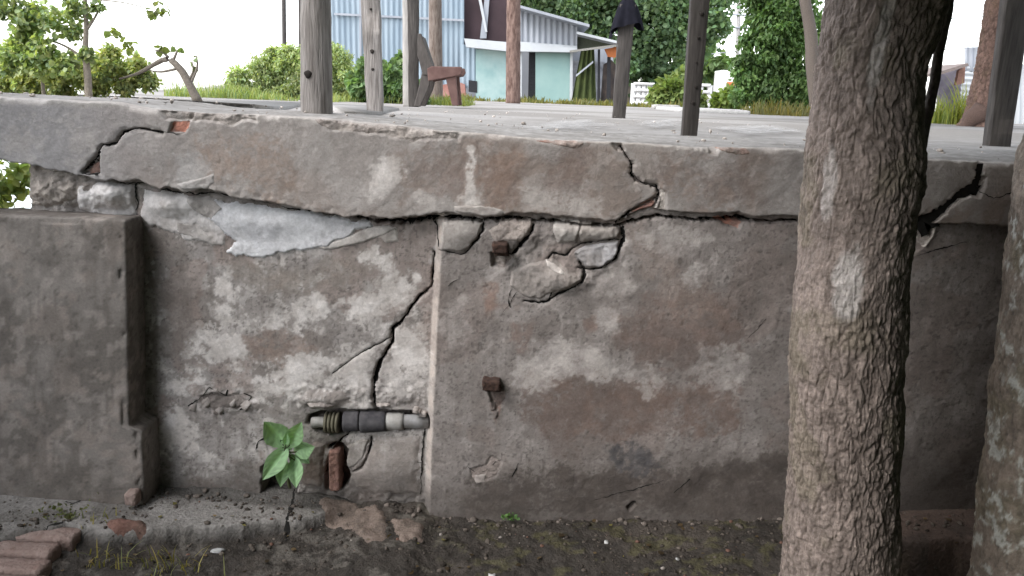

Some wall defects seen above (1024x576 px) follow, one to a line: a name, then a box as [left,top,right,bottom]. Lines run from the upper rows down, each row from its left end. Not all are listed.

crack [82,127,234,214]
flaking render [29,158,399,258]
rust [168,118,319,212]
flaking render [440,189,665,299]
crack [503,146,797,312]
crack [914,163,1011,257]
crack [260,201,554,404]
spalling [189,388,252,416]